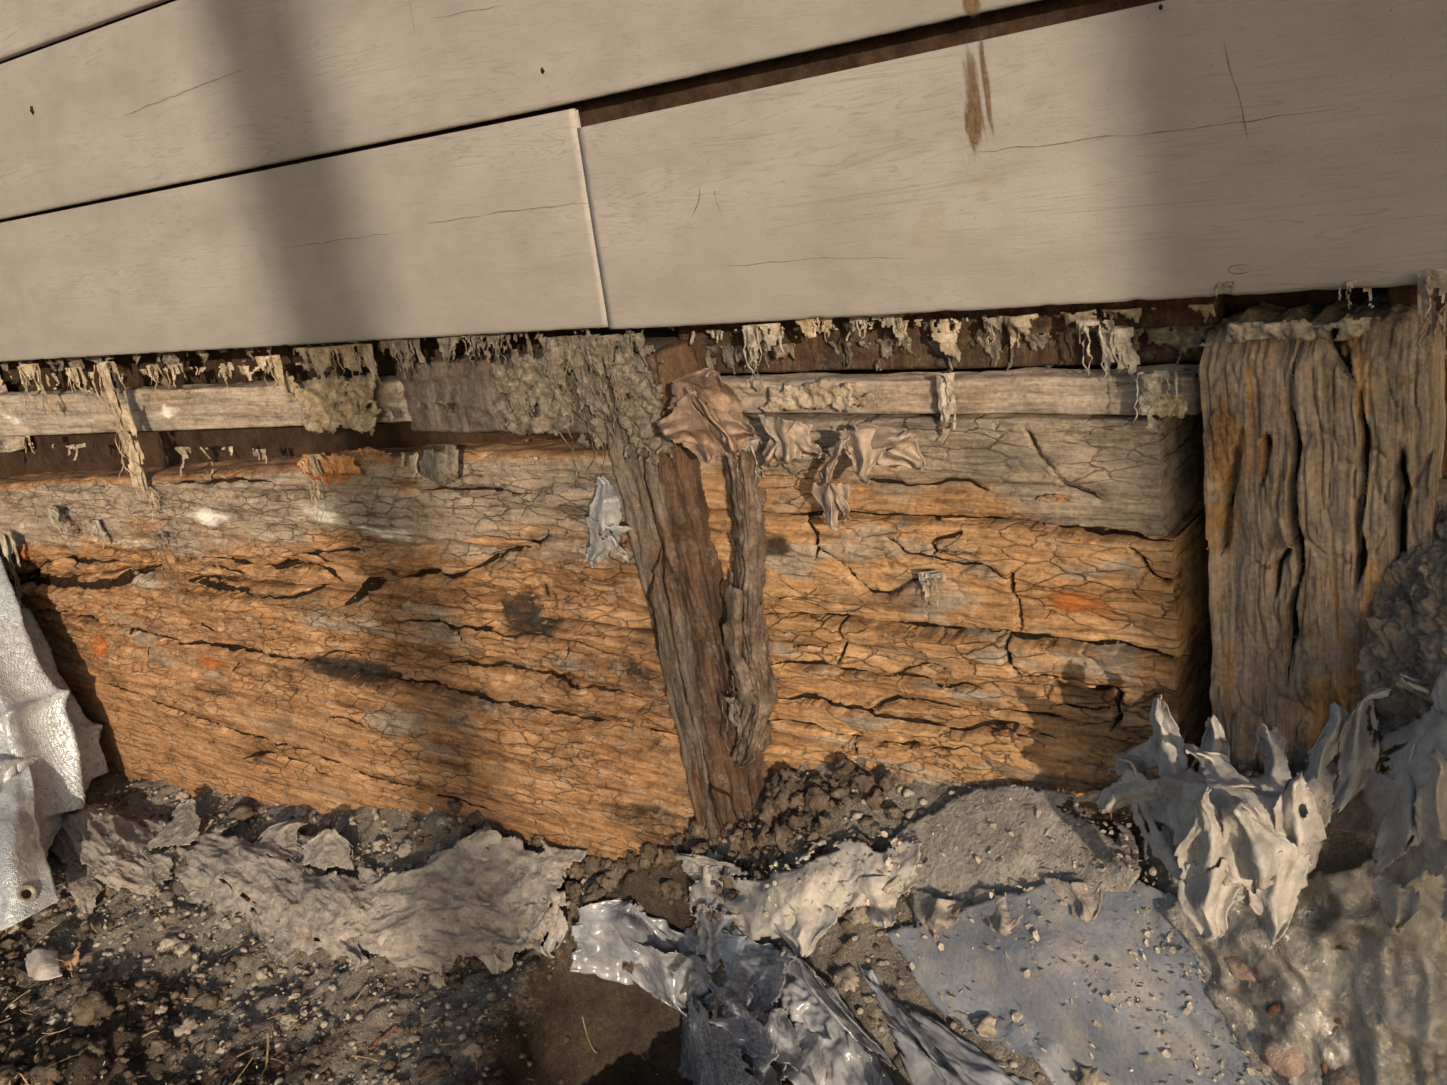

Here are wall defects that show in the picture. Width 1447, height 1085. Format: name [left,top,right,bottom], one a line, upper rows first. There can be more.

corrosion [963,0,979,15]
crack [977,109,1331,152]
spalling [337,447,392,465]
peeling [417,444,459,486]
crack [762,428,1192,752]
crack [9,454,741,839]